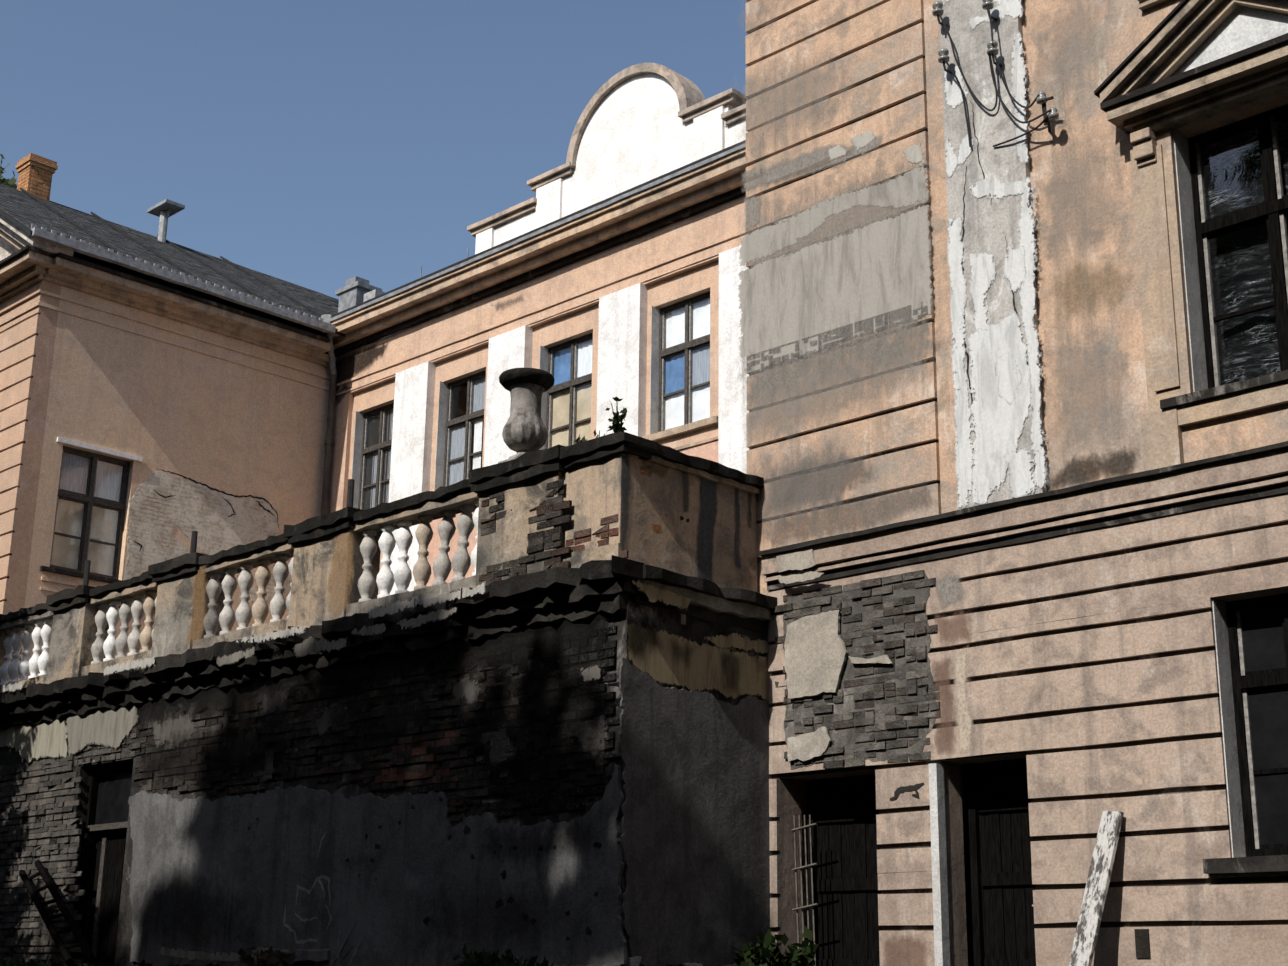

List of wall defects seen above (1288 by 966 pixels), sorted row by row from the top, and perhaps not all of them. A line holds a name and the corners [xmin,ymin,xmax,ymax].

peeling [743,130,882,230]
peeling [902,142,925,164]
peeling [944,0,1046,508]
peeling [124,470,279,580]
flaking render [217,479,629,666]
peeling [580,665,601,682]
flaking render [626,549,941,770]
peeling [575,714,608,760]
flaking render [0,654,516,966]